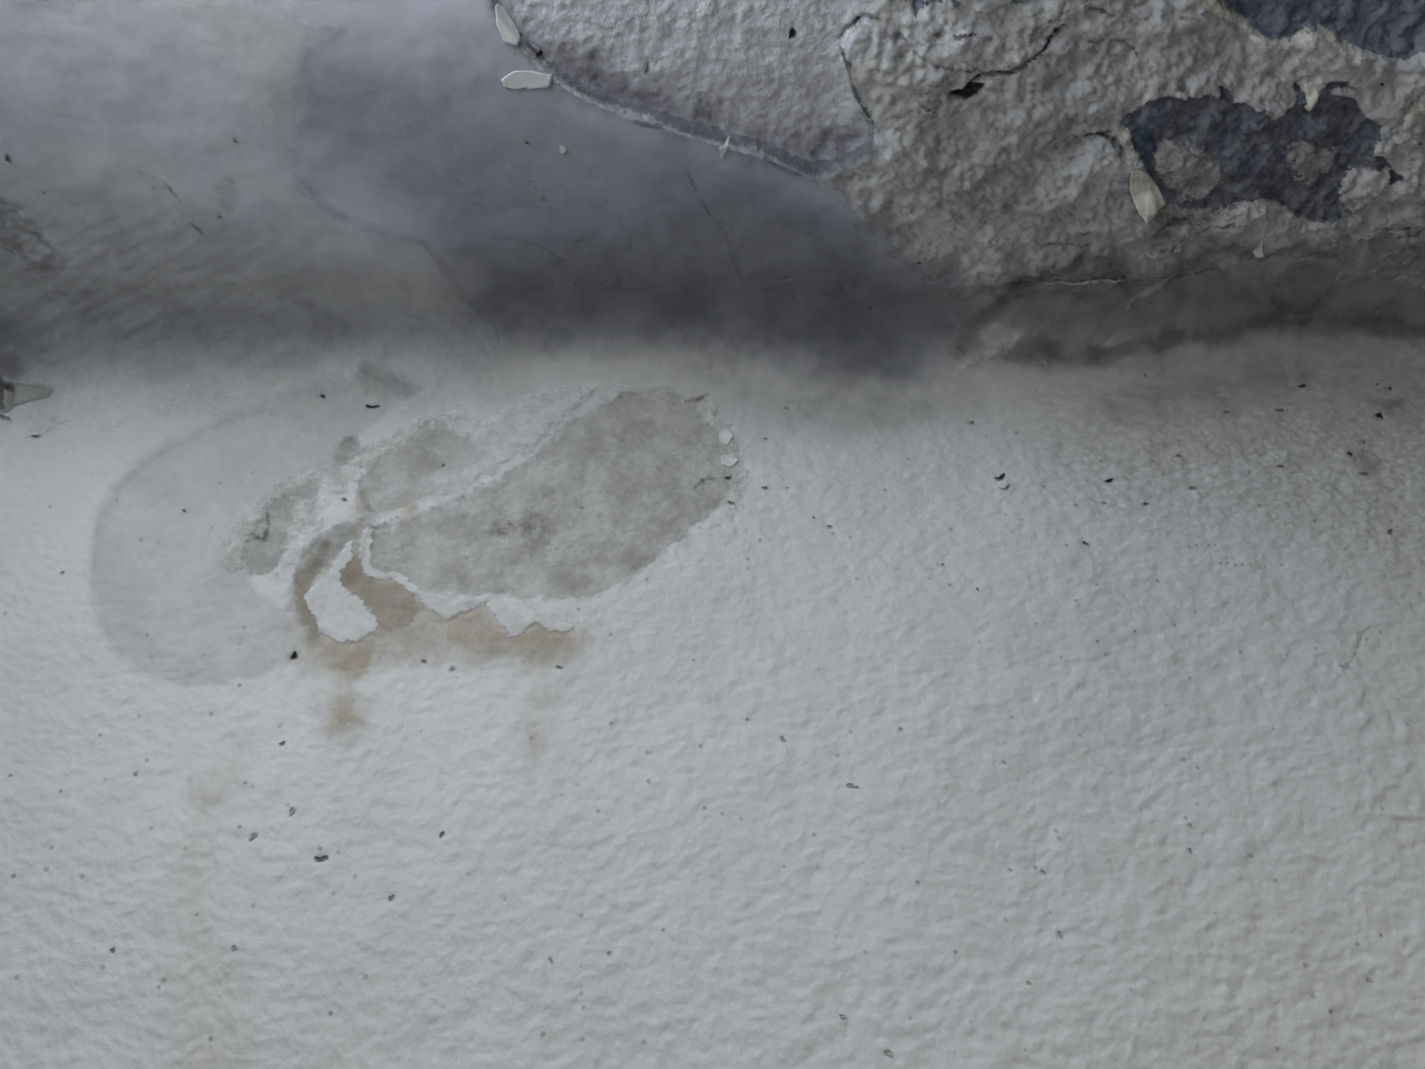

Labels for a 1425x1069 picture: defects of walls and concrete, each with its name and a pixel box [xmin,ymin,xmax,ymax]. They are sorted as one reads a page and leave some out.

damp [0,0,496,391]
peeling [821,0,1425,300]
damp [962,279,1399,368]